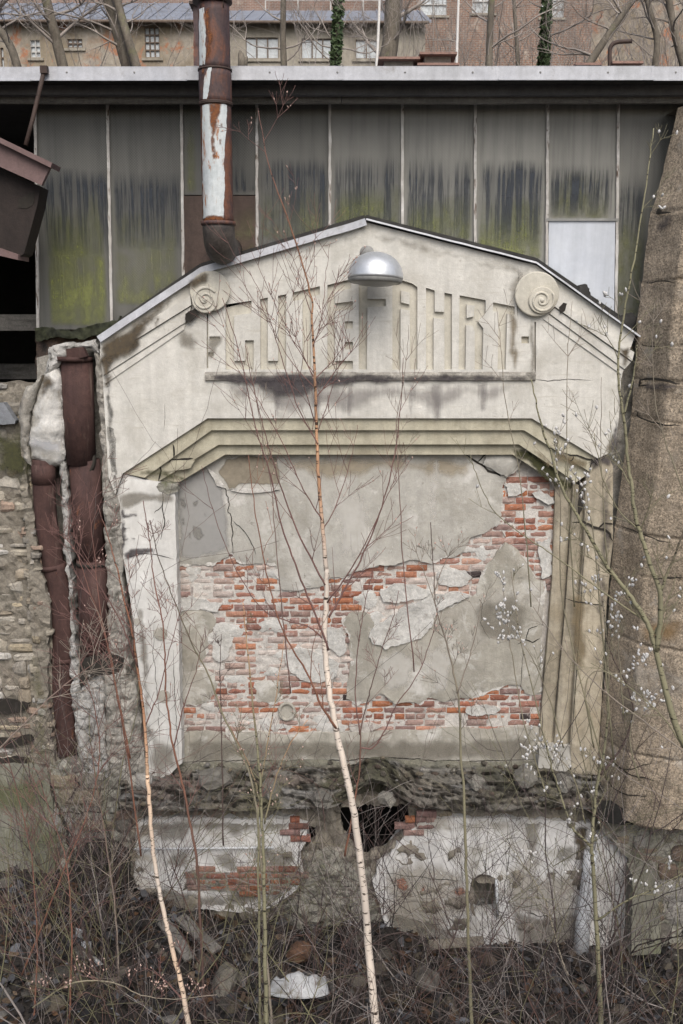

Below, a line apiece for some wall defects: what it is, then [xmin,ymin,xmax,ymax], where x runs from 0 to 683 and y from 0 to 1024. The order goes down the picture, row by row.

corrosion [201,103,223,221]
water stain [44,176,179,230]
water stain [267,165,326,220]
water stain [339,168,470,225]
water stain [482,165,612,227]
spalling [185,308,199,322]
water stain [215,374,500,395]
spalling [206,456,280,493]
spalling [180,471,554,735]
crack [329,453,671,762]
spalling [280,816,316,842]
spalling [341,803,437,852]